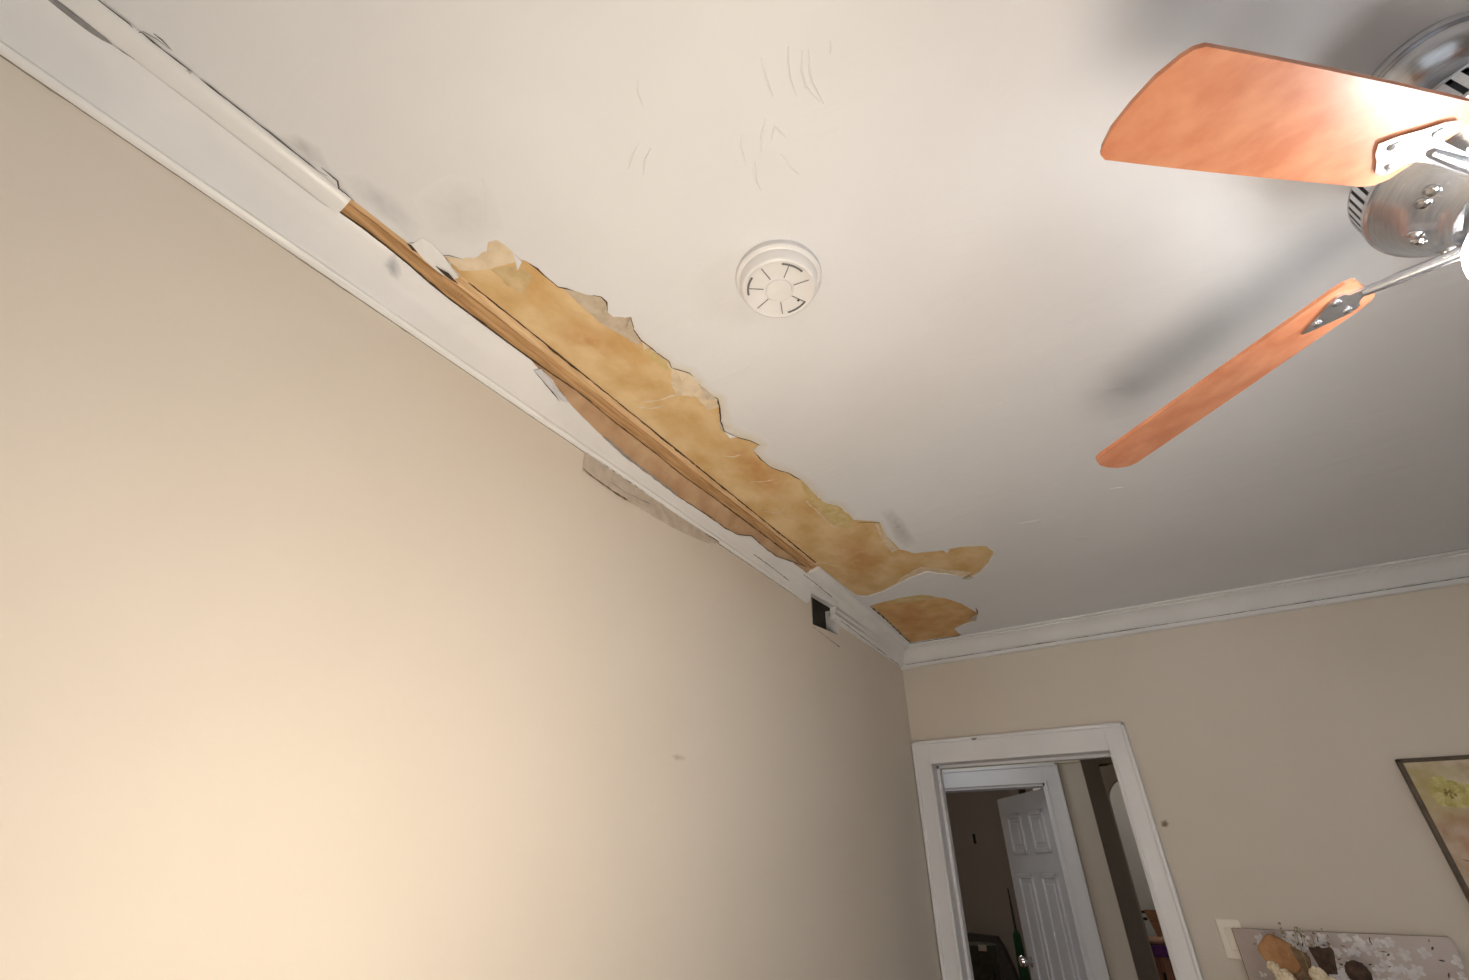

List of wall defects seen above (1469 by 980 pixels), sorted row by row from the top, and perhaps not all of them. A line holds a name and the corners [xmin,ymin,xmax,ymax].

peeling [407,238,994,647]